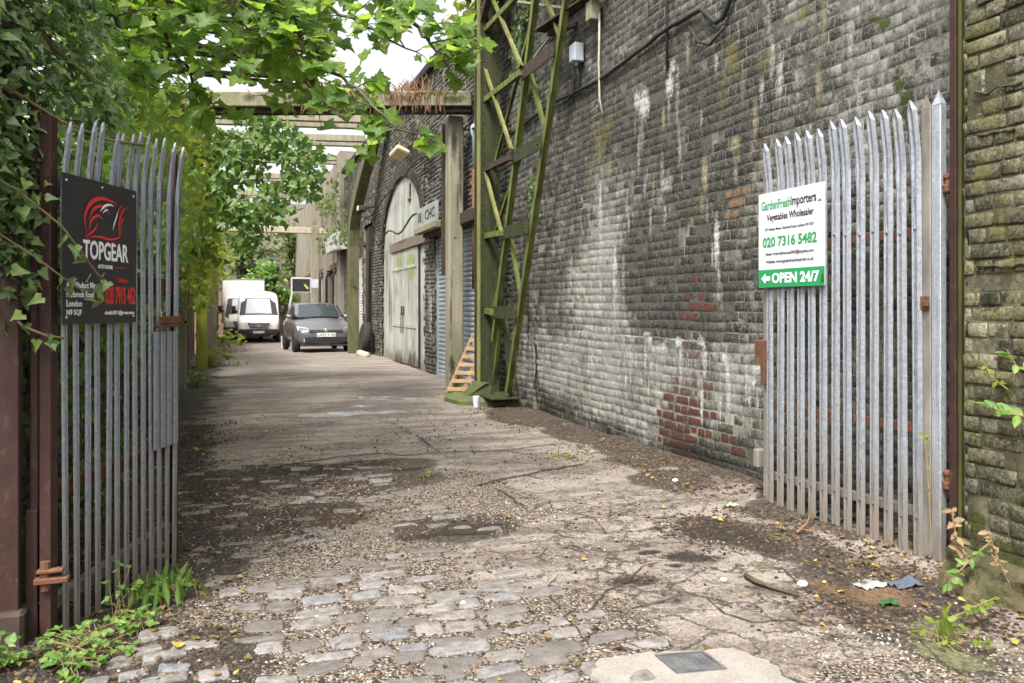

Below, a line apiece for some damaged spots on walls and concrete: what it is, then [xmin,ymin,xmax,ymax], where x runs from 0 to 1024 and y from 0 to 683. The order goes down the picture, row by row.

leakage [634,85,649,170]
leakage [662,44,689,162]
leakage [644,166,682,231]
spalling [535,332,745,459]
crack [246,437,641,540]